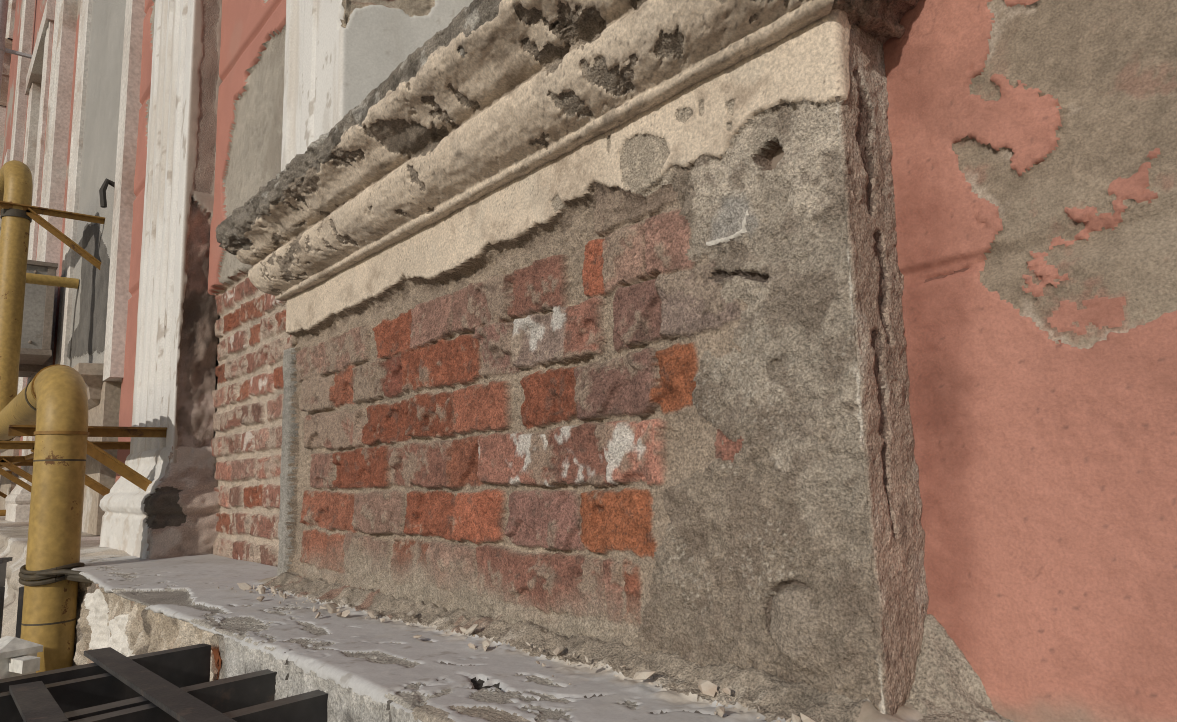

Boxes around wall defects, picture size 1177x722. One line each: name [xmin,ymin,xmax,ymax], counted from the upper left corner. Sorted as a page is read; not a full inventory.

flaking render [952,0,1177,349]
flaking render [143,0,749,646]
crack [708,270,769,283]
peeling [82,559,421,668]
peeling [384,673,572,722]